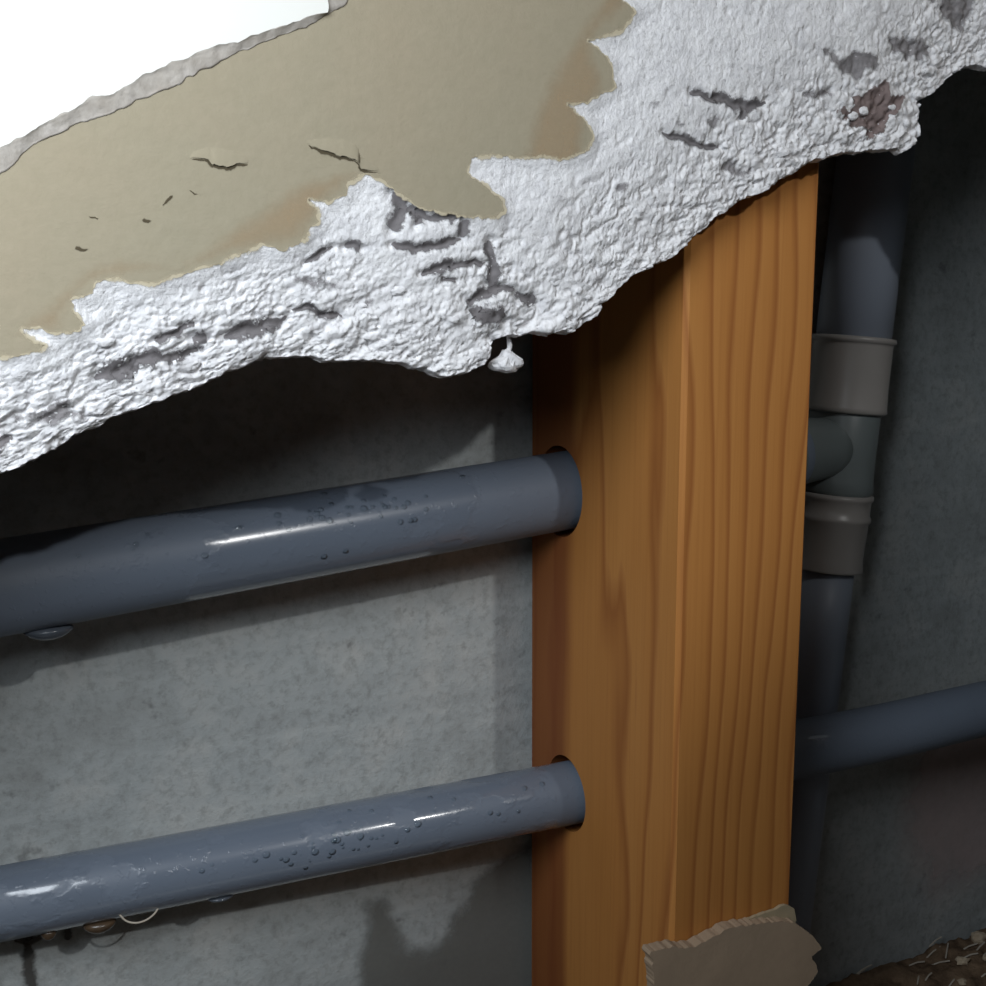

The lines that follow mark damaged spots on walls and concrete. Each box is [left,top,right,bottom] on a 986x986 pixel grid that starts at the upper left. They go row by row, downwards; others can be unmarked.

spalling [0,0,986,474]
leakage [836,79,905,140]